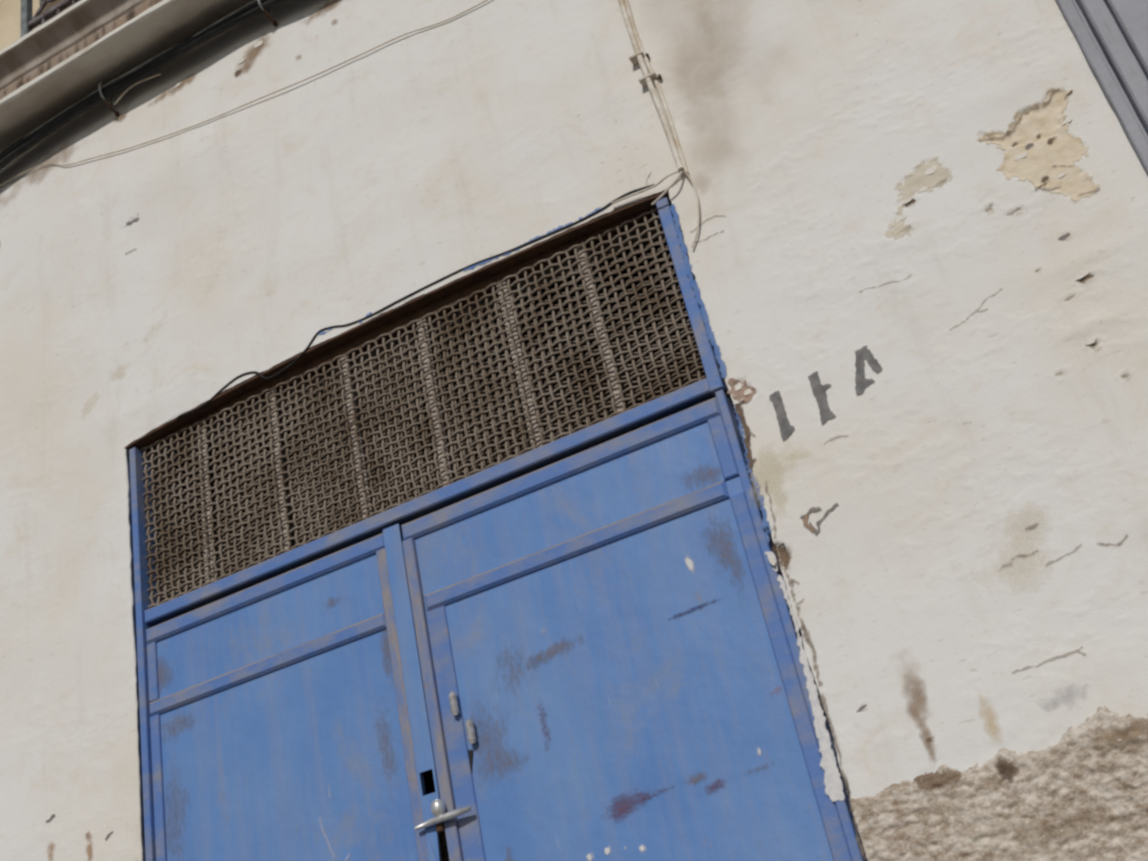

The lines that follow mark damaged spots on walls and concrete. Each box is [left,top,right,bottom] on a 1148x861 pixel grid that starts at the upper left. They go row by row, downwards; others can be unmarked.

spalling [978,88,1100,201]
peeling [885,157,952,239]
spalling [727,378,757,404]
water stain [910,681,925,717]
water stain [923,730,933,753]
spalling [914,768,961,791]
spalling [996,758,1018,782]